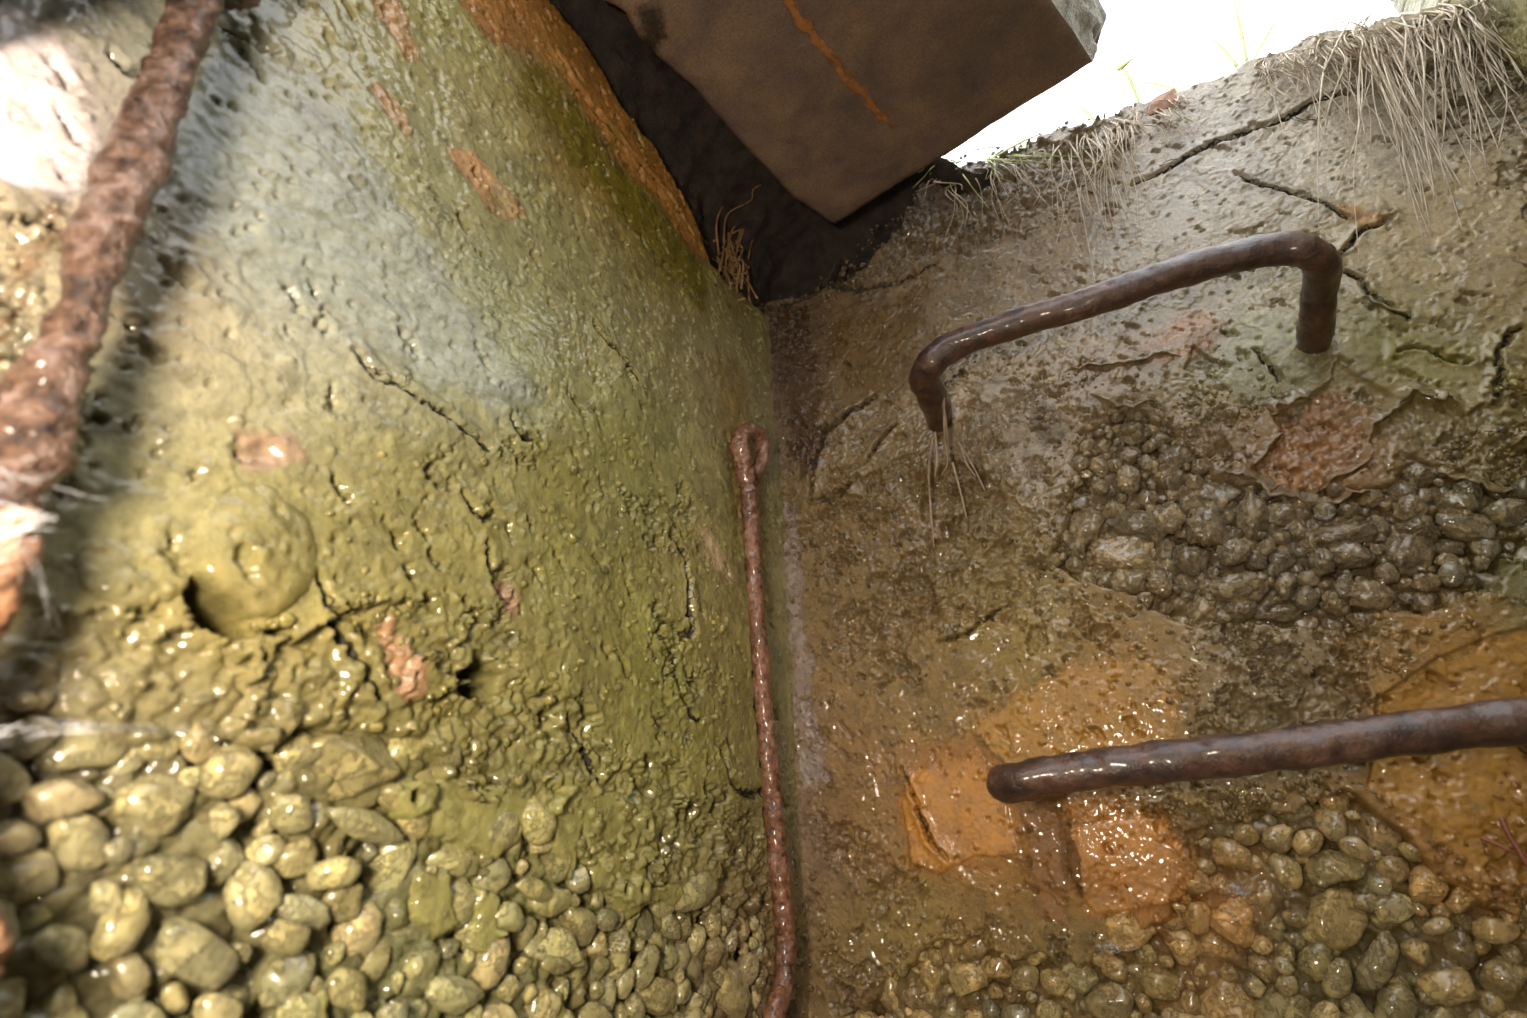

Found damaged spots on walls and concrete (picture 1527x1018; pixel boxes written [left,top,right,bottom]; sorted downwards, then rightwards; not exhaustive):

rust [0,0,261,640]
crack [354,351,540,452]
rust [460,0,709,260]
spalling [1041,359,1527,632]
crack [1135,86,1522,397]
rust [0,910,16,978]
spalling [0,714,765,1018]
rust [729,422,797,1018]
rust [898,654,1192,926]
spalling [843,791,1527,1018]
rust [1367,746,1527,887]
rust [1377,630,1527,714]